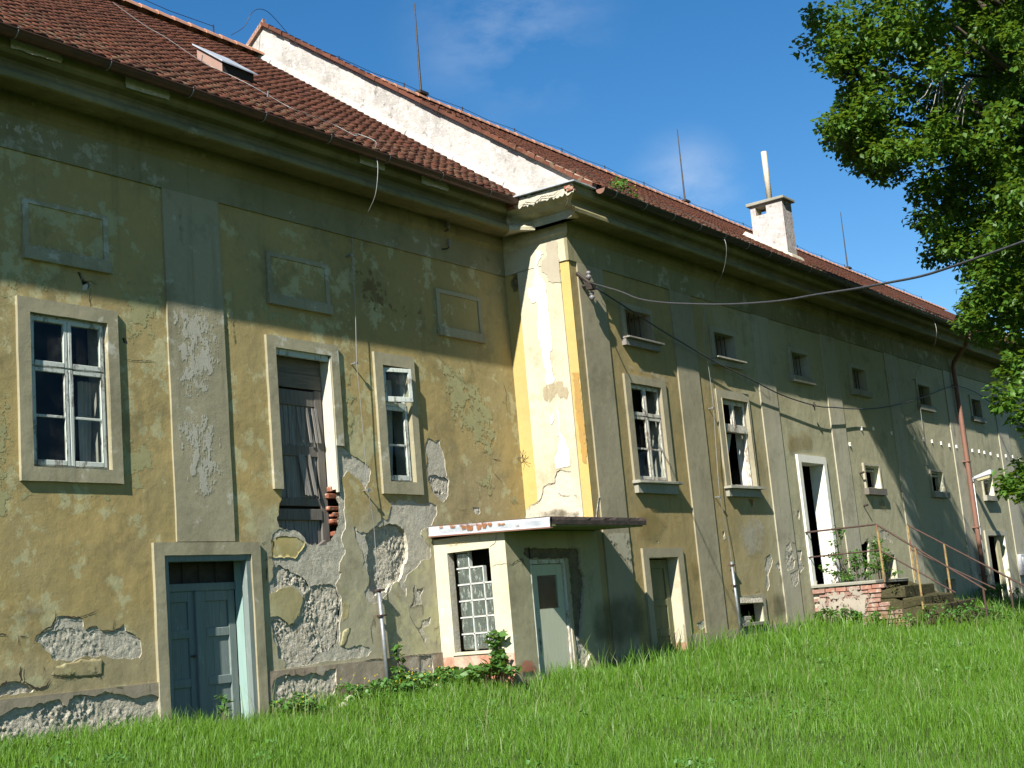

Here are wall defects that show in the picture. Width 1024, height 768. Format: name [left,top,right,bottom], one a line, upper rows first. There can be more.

spalling [506,183,577,211]
peeling [173,299,231,398]
spalling [510,240,587,518]
peeling [178,415,222,496]
spalling [268,373,449,716]
spalling [764,543,804,590]
spalling [35,616,141,675]
spalling [0,681,158,743]